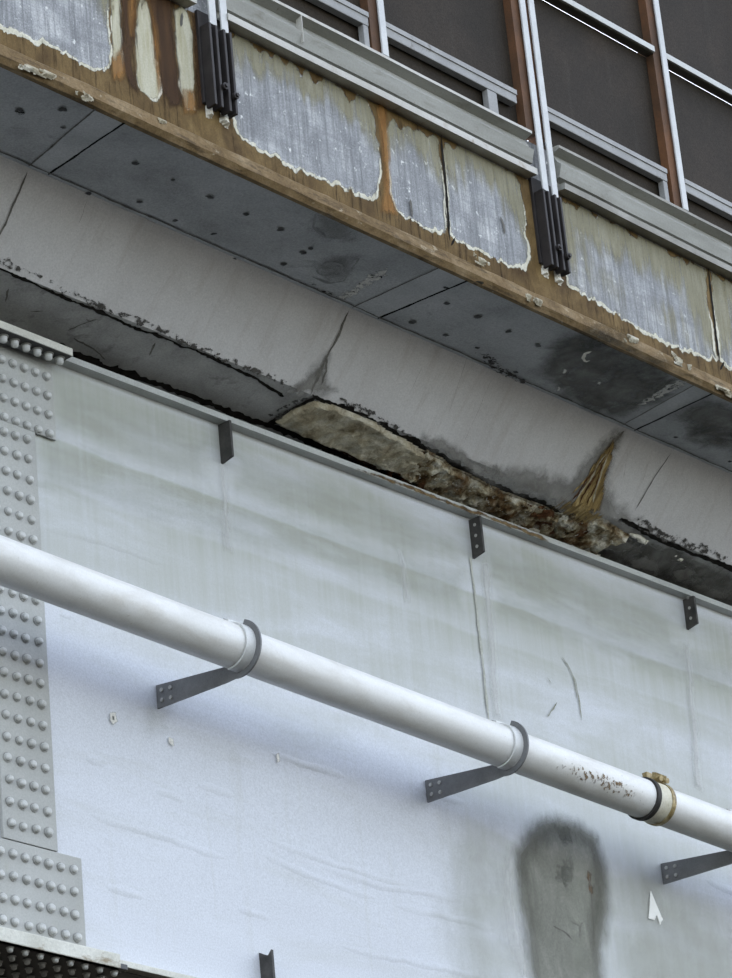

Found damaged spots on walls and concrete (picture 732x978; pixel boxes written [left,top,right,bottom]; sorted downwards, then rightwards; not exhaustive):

peeling [18,63,57,80]
crack [0,173,27,235]
rust [0,0,732,385]
peeling [0,259,291,387]
crack [0,268,563,513]
spalling [475,347,525,384]
spalling [638,351,692,405]
spalling [267,398,726,562]
crack [618,455,732,572]
crack [548,657,582,718]
rust [557,765,632,797]
damp [514,820,607,978]